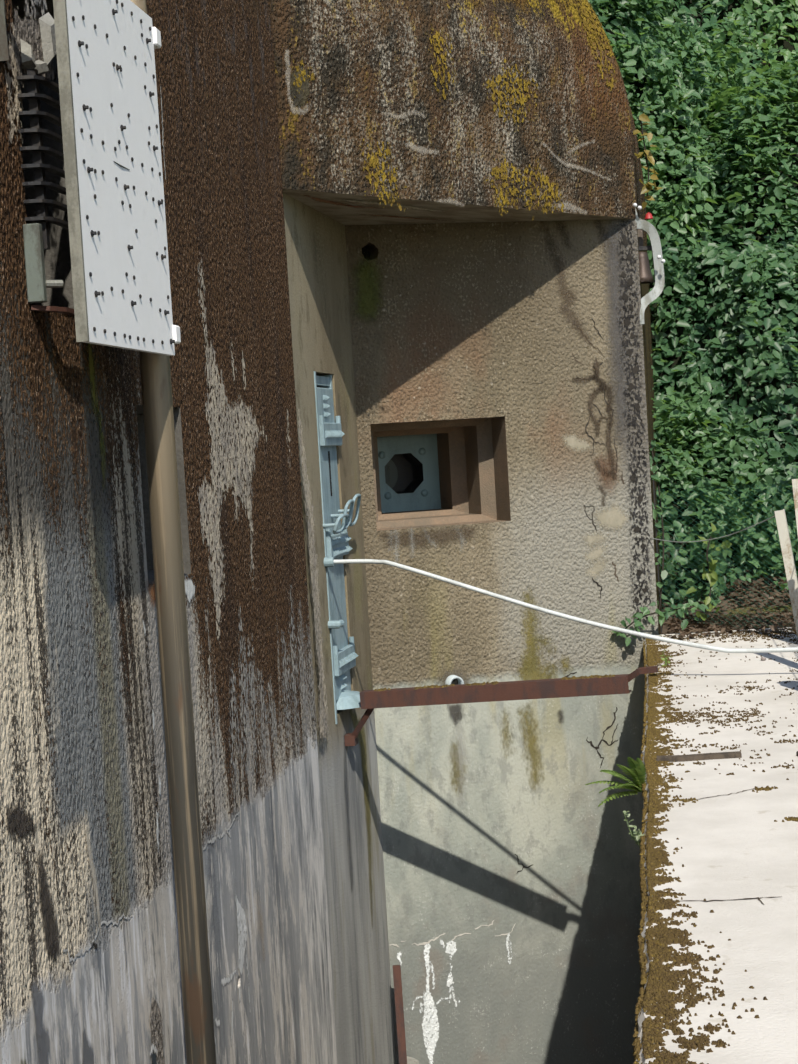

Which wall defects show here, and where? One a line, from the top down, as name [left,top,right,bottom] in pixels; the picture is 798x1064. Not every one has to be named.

crack [572,319,624,531]
crack [586,707,618,768]
leakage [7,804,35,838]
leakage [37,853,60,962]
efflorescence [412,940,460,1064]